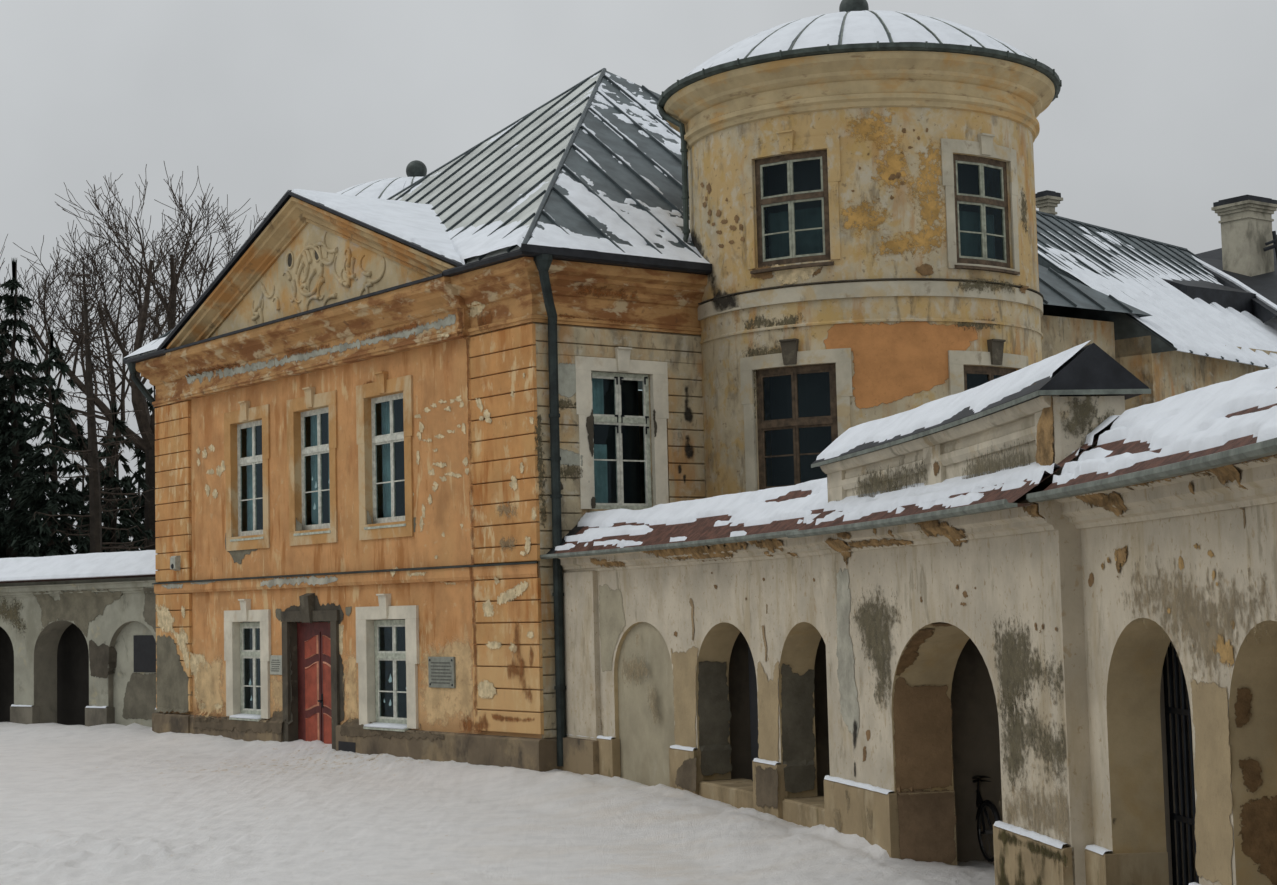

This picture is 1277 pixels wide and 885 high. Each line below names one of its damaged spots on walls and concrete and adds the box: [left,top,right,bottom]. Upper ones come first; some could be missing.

peeling [841,108,946,260]
peeling [413,395,492,532]
peeling [509,462,525,490]
peeling [33,589,123,679]
peeling [122,581,223,720]
peeling [477,679,497,699]
peeling [482,576,528,617]
flaking render [591,558,626,568]
water stain [852,587,902,705]
water stain [993,619,1066,791]
peeling [1190,673,1277,885]